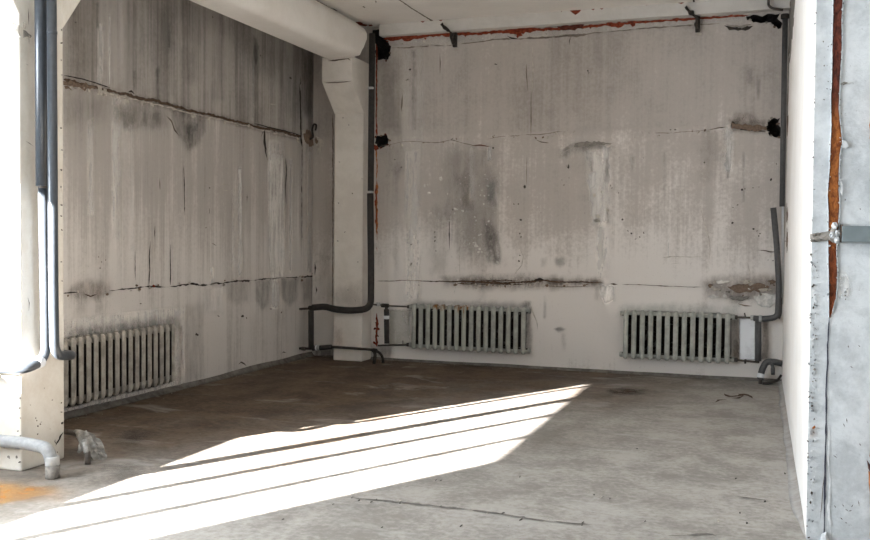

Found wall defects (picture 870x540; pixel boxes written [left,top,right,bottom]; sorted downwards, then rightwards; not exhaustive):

crack [64,75,302,212]
crack [64,115,334,305]
rust [374,15,748,234]
spalling [731,0,795,138]
crack [396,278,684,289]
spalling [707,279,776,308]